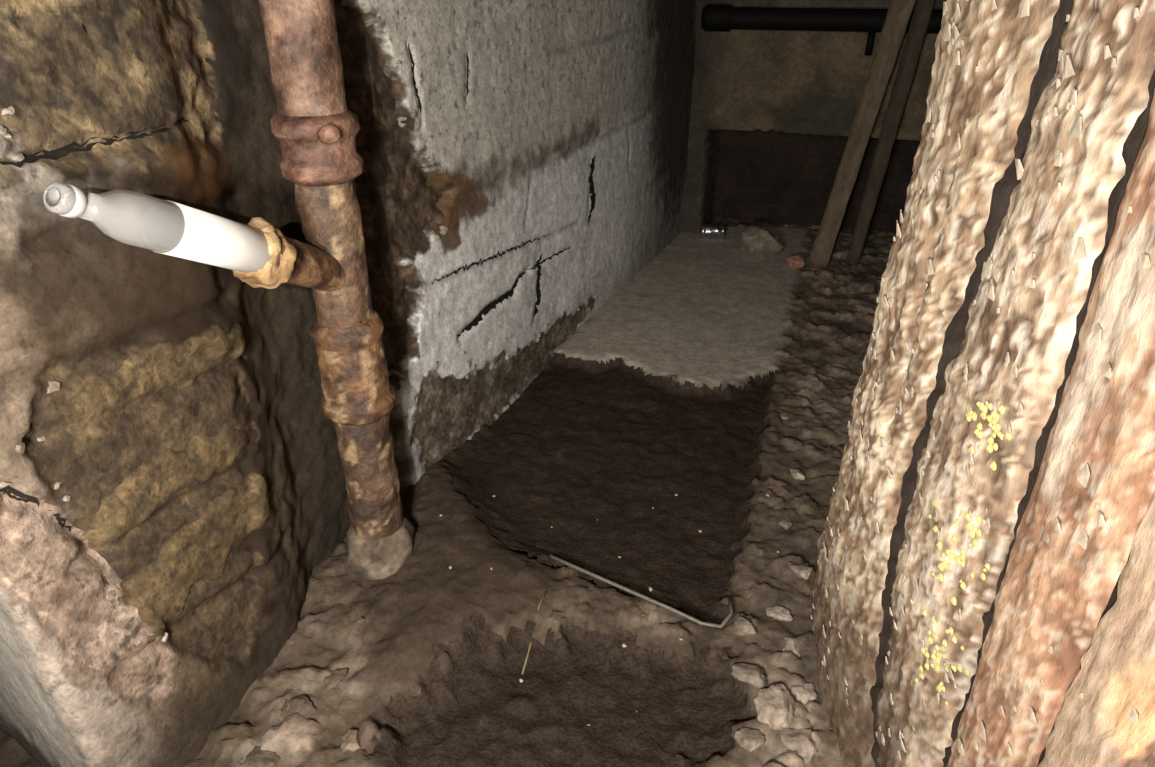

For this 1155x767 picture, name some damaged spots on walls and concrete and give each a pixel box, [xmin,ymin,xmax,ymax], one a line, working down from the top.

flaking render [0,0,224,186]
flaking render [334,0,456,390]
crack [431,156,596,337]
peeling [410,295,598,472]
flaking render [0,323,273,706]